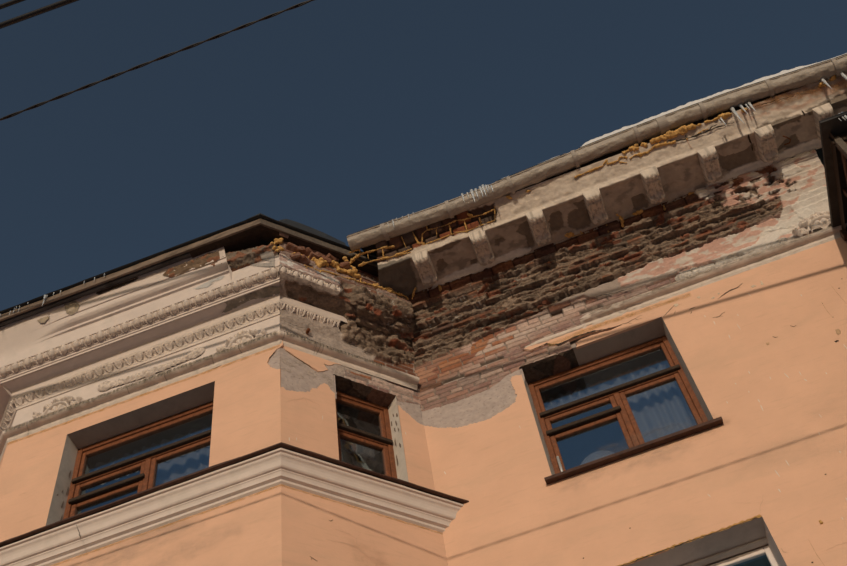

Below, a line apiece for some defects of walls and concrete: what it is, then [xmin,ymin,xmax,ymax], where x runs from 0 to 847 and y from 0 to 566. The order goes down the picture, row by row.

spalling [163,149,831,466]